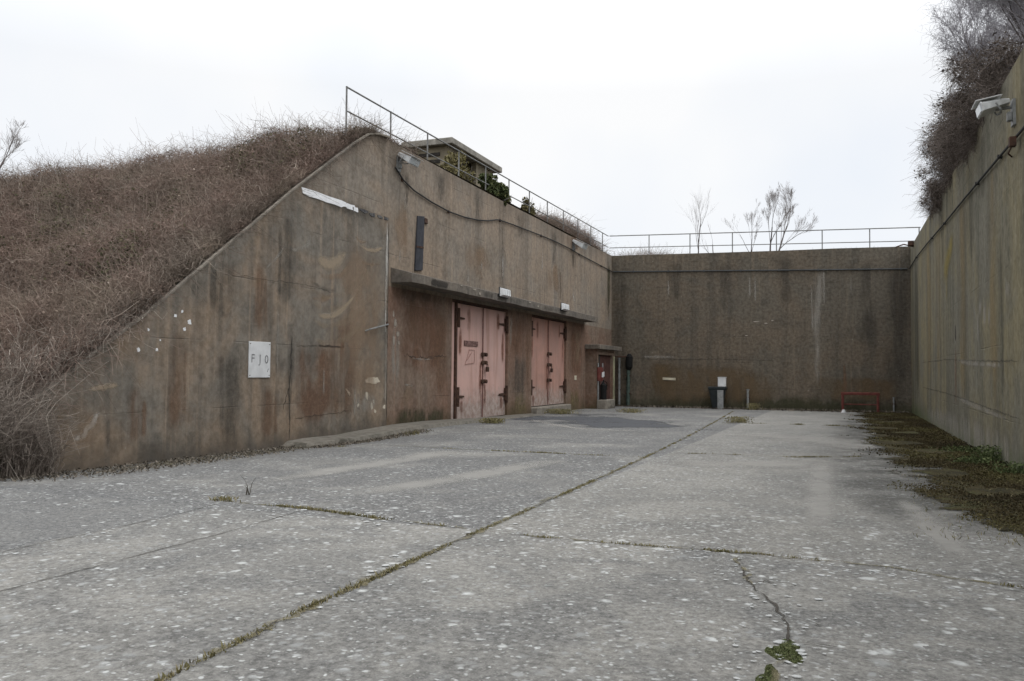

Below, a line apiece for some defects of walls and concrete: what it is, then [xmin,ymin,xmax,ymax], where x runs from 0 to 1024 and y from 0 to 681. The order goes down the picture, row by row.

crack [0,411,1024,681]